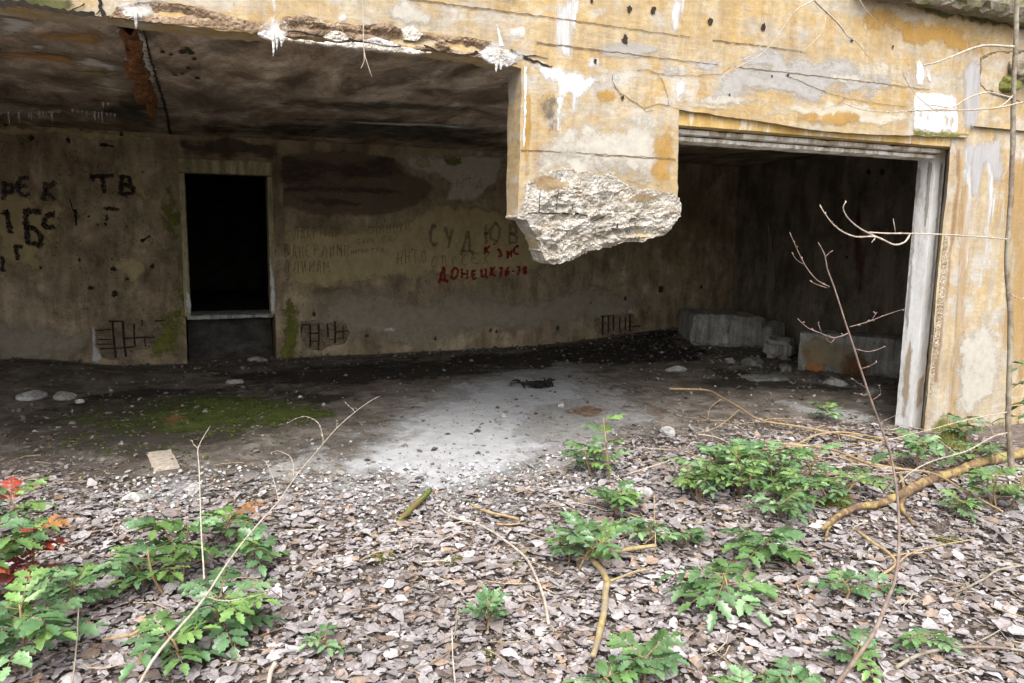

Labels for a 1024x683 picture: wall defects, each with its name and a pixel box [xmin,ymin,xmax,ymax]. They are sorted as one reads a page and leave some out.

rust [118,26,158,120]
crack [142,30,172,134]
spalling [109,0,505,60]
crack [288,30,370,43]
water stain [257,0,432,56]
water stain [478,0,617,157]
crack [420,0,929,112]
peeling [685,50,958,133]
peeling [286,114,682,287]
water stain [17,286,708,460]